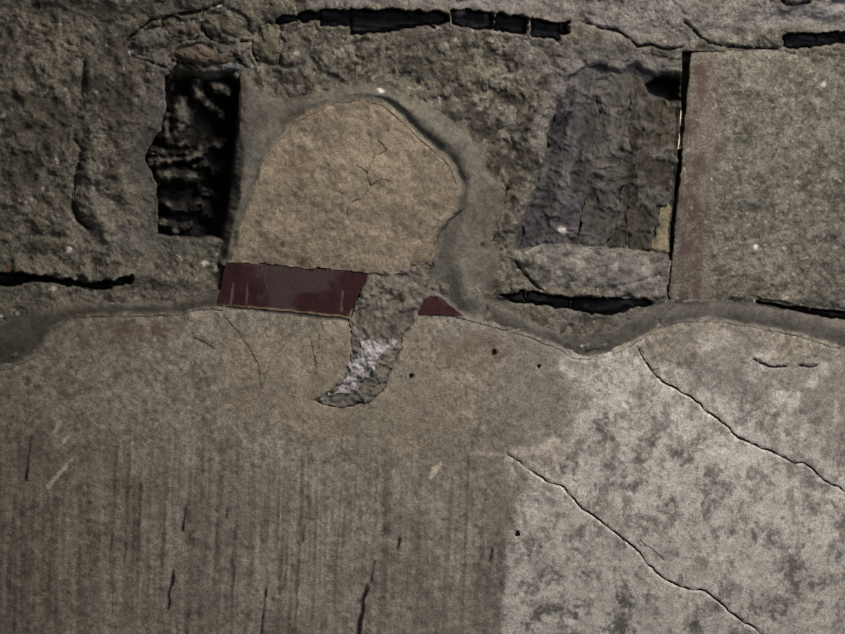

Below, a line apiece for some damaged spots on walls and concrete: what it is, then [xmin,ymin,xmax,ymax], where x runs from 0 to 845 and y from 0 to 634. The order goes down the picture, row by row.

crack [573,20,781,65]
crack [781,0,813,8]
spalling [319,258,434,408]
crack [639,349,845,492]
crack [508,454,763,634]